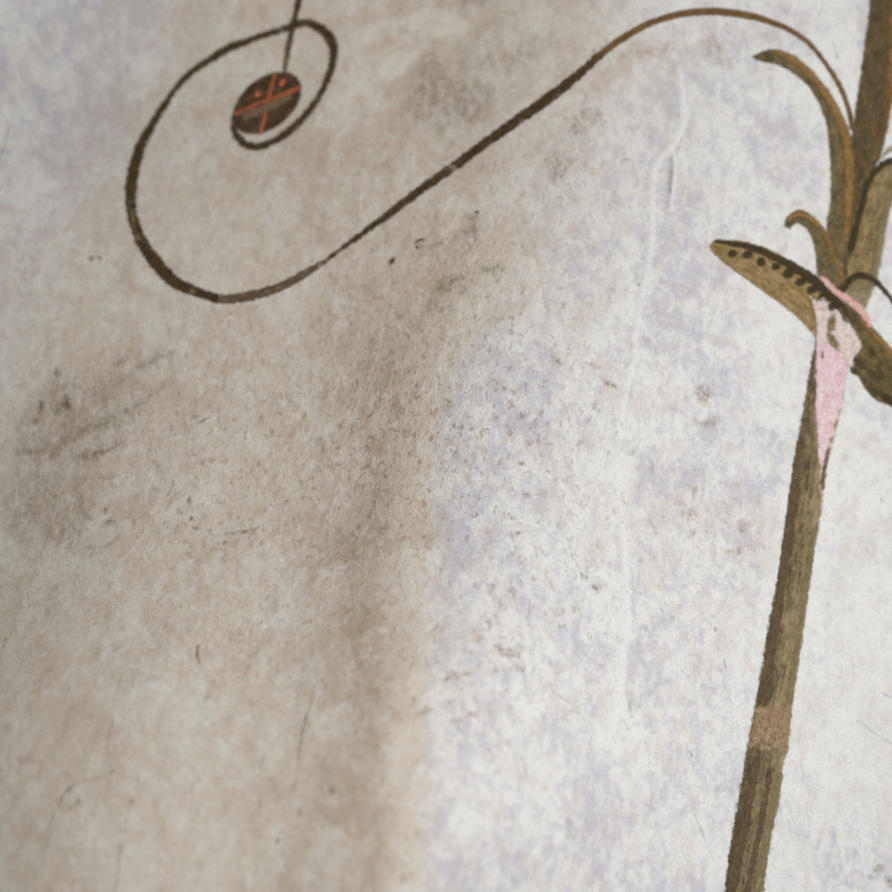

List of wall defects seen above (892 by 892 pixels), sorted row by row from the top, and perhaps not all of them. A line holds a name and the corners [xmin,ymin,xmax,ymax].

crack [603,62,693,751]